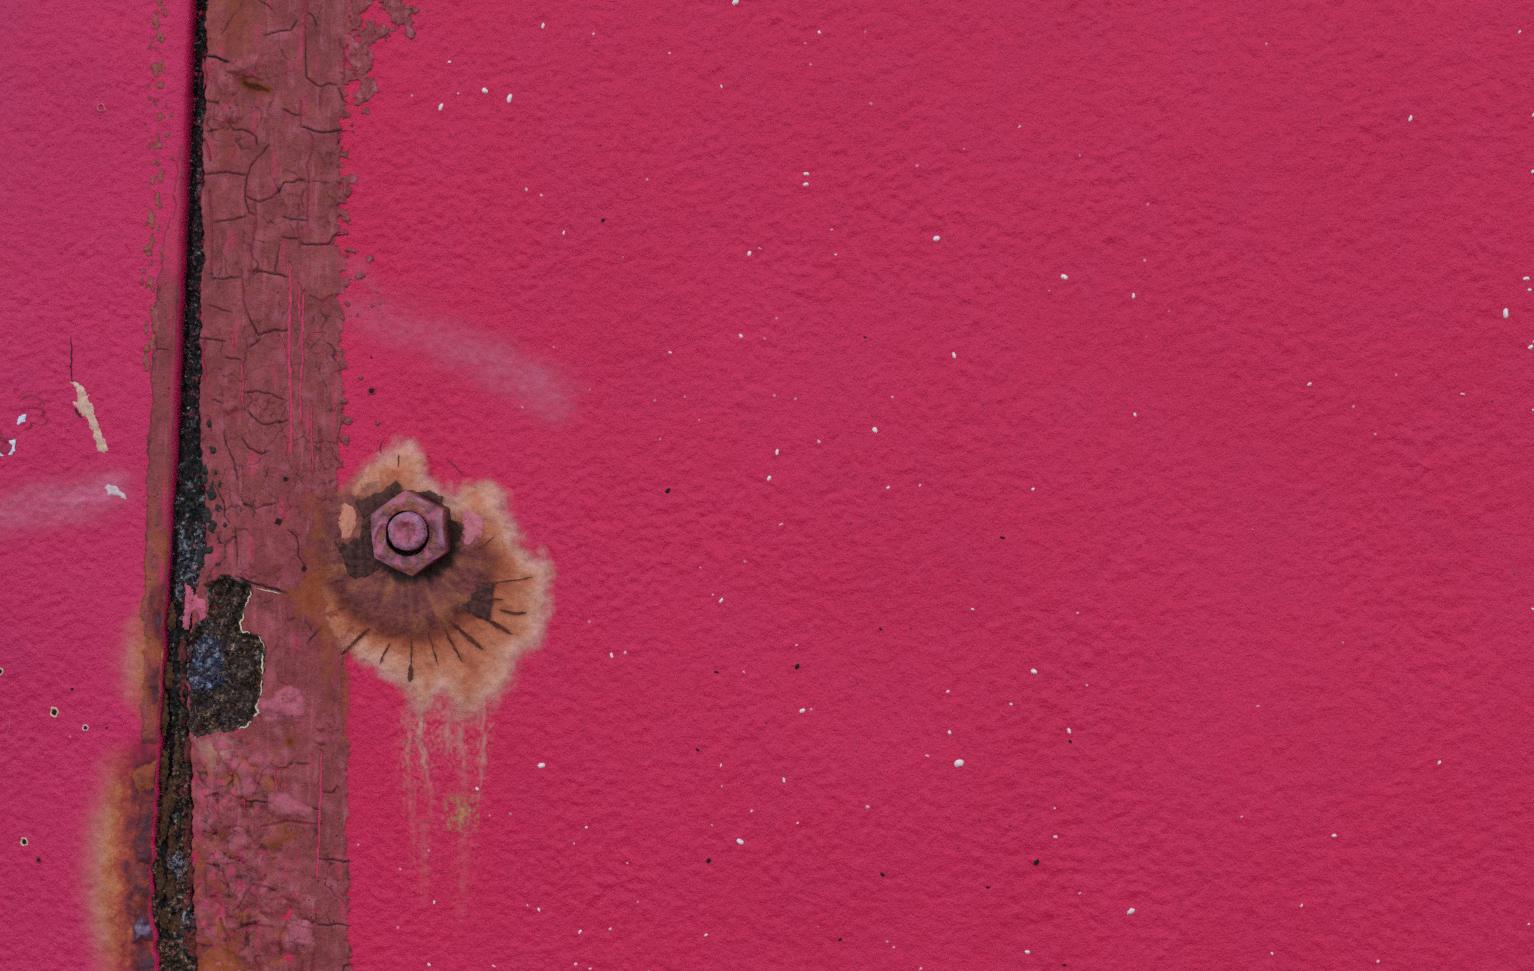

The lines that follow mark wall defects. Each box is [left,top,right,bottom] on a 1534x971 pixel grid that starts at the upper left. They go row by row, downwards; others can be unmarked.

peeling [105,485,127,499]
peeling [138,0,420,971]
corrosion [130,583,165,704]
corrosion [288,440,555,768]
corrosion [94,749,157,971]
corrosion [445,796,480,829]